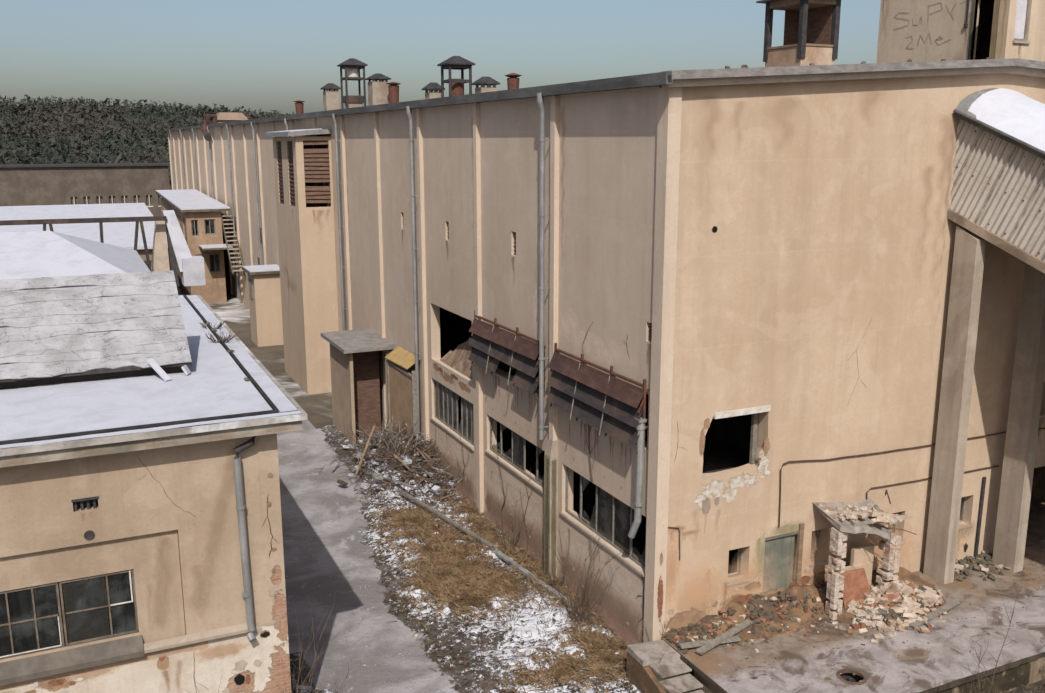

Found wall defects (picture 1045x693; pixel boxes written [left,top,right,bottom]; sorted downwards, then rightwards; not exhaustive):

spalling [433,363,471,393]
spalling [694,437,771,514]
crack [264,473,279,574]
flaking render [222,566,292,693]
spalling [24,676,84,693]